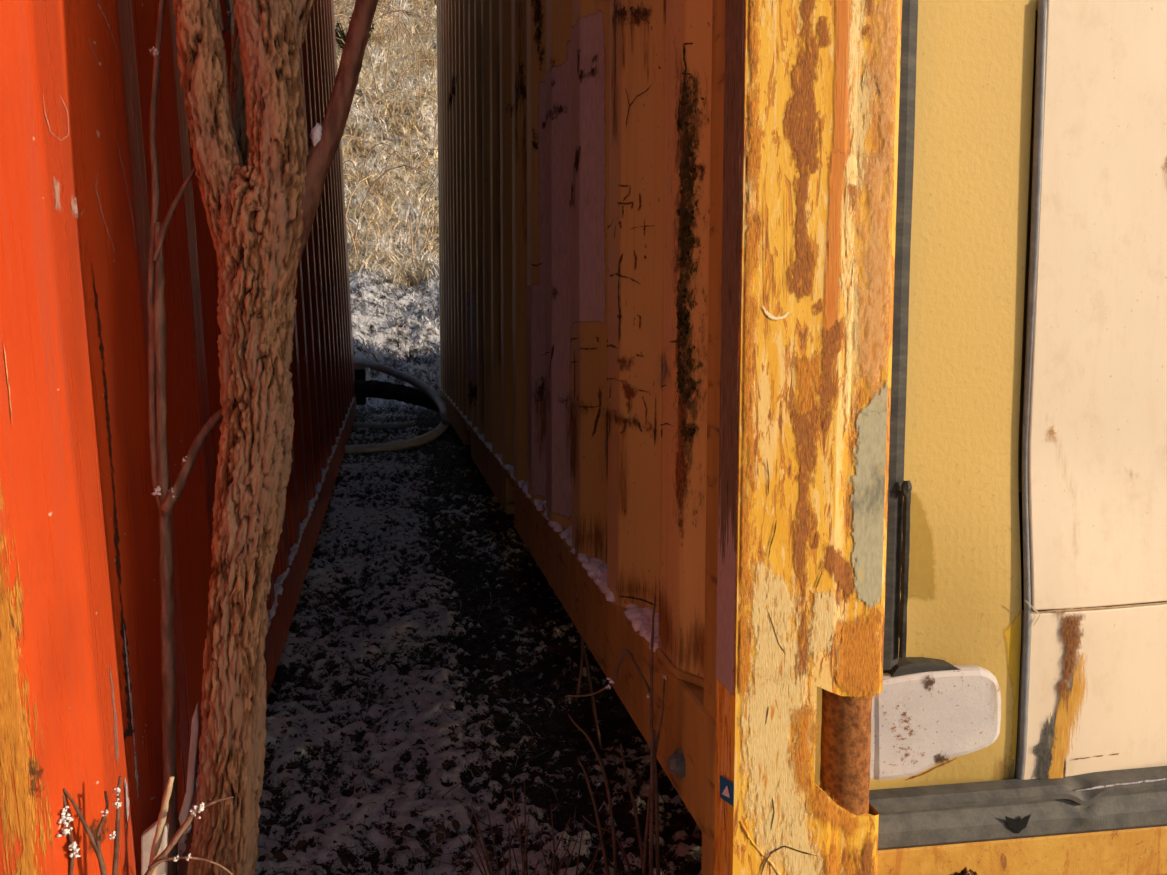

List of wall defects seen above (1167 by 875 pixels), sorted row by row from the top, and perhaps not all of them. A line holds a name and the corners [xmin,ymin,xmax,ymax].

rust [613,0,666,132]
rust [862,0,875,39]
peeling [718,0,754,562]
rust [784,0,831,316]
rust [848,185,857,214]
peeling [824,0,899,609]
rust [791,317,855,675]
peeling [738,558,846,875]
rust [787,705,875,875]
rust [833,608,881,699]
rust [1048,611,1087,779]